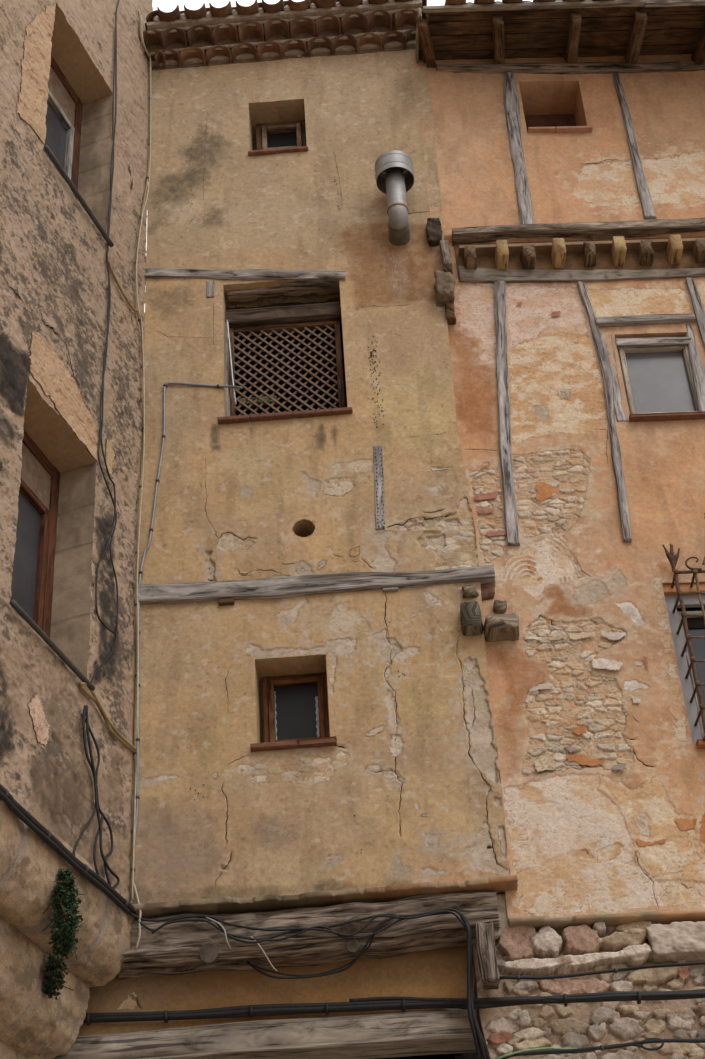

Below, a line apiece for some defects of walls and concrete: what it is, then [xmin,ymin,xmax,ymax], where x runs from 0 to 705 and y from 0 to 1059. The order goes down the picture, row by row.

peeling [301,459,373,496]
crack [387,509,450,528]
peeling [372,283,690,572]
crack [214,755,247,890]
crack [375,594,403,835]
crack [456,640,499,865]
peeling [462,601,705,916]